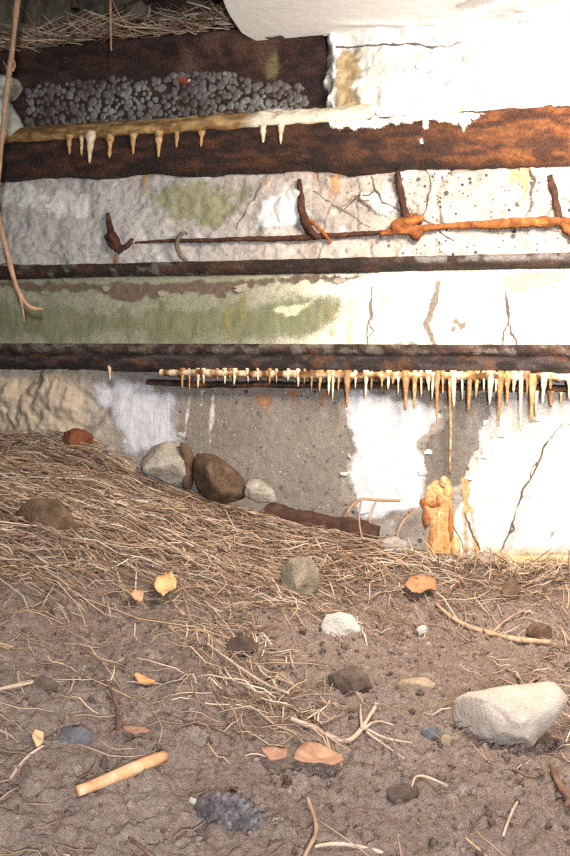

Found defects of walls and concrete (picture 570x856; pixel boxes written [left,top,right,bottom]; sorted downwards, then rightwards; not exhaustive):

damp [4,104,485,163]
rust [328,173,341,200]
rust [510,168,532,204]
damp [272,287,319,318]
crack [423,280,441,345]
crack [502,292,518,345]
damp [0,366,570,475]
peeling [176,387,561,562]
rust [420,475,480,557]